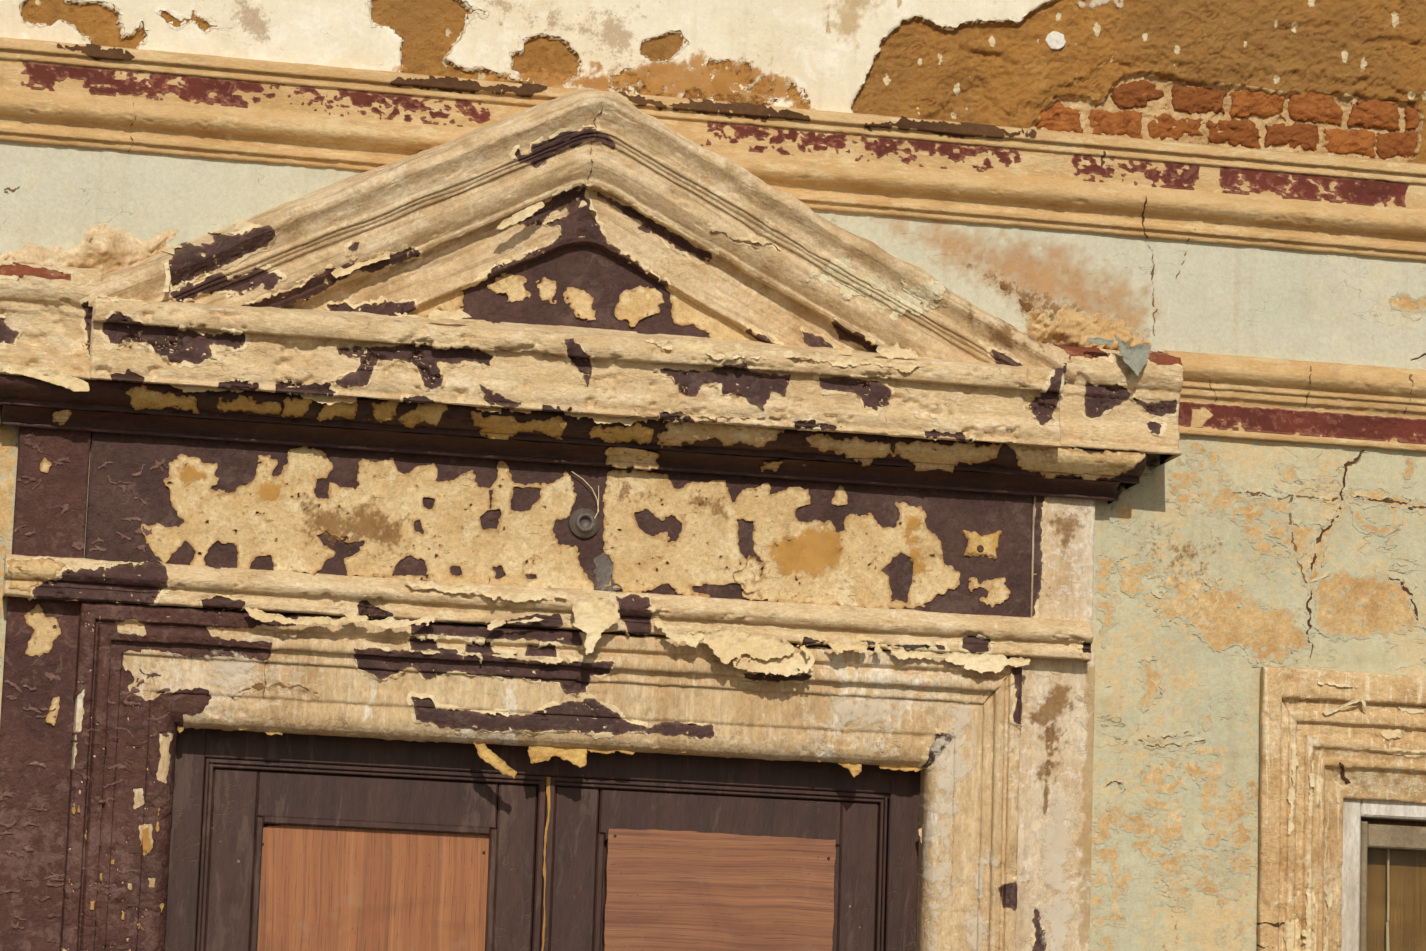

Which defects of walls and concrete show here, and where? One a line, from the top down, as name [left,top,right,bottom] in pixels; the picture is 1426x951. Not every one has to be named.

flaking render [606,0,1426,171]
peeling [509,124,618,168]
peeling [1071,154,1200,190]
peeling [1219,167,1409,207]
flaking render [1389,289,1426,321]
crack [1404,352,1426,413]
peeling [1023,335,1426,668]
crack [1232,447,1426,658]
peeling [1370,729,1426,758]
peeling [1090,707,1259,951]
peeling [1287,744,1317,850]
peeling [1283,869,1333,951]